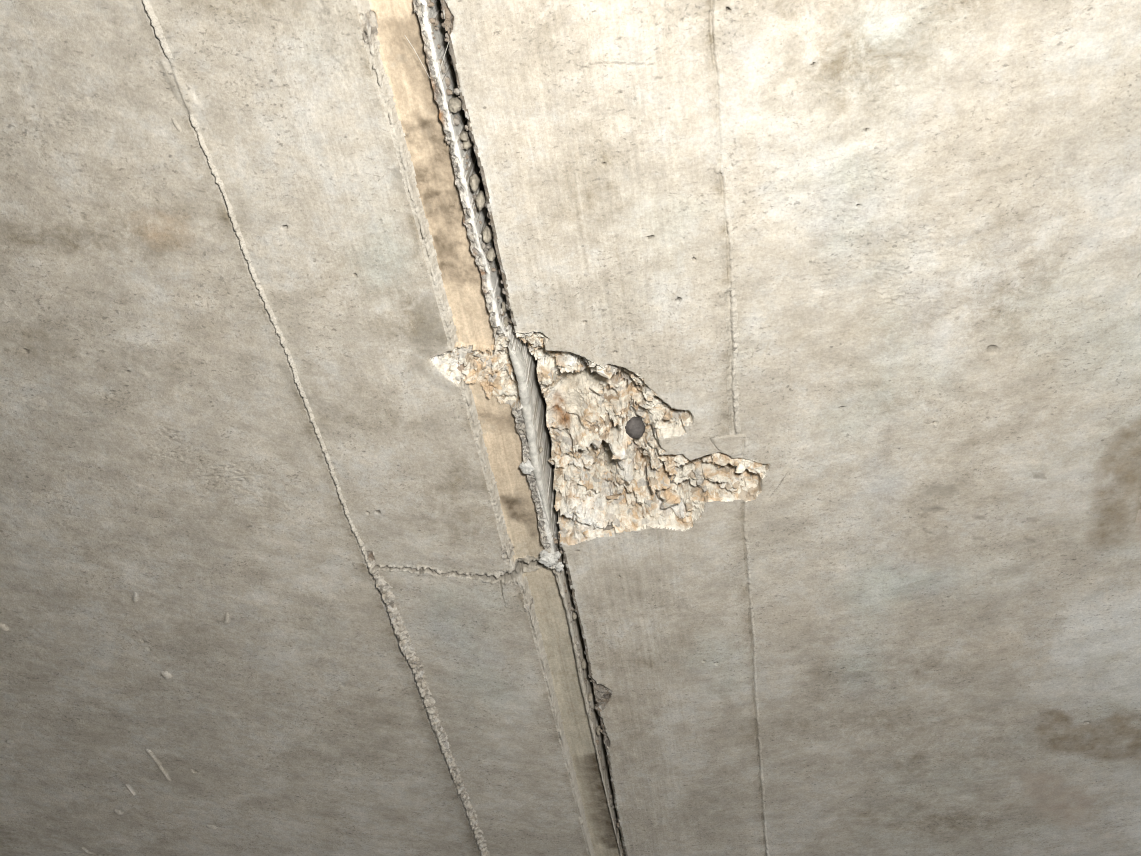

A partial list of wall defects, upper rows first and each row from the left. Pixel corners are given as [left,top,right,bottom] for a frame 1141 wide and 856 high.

spalling [413,0,770,856]
leakage [1075,408,1141,554]
crack [369,548,560,611]
leakage [1033,707,1141,763]